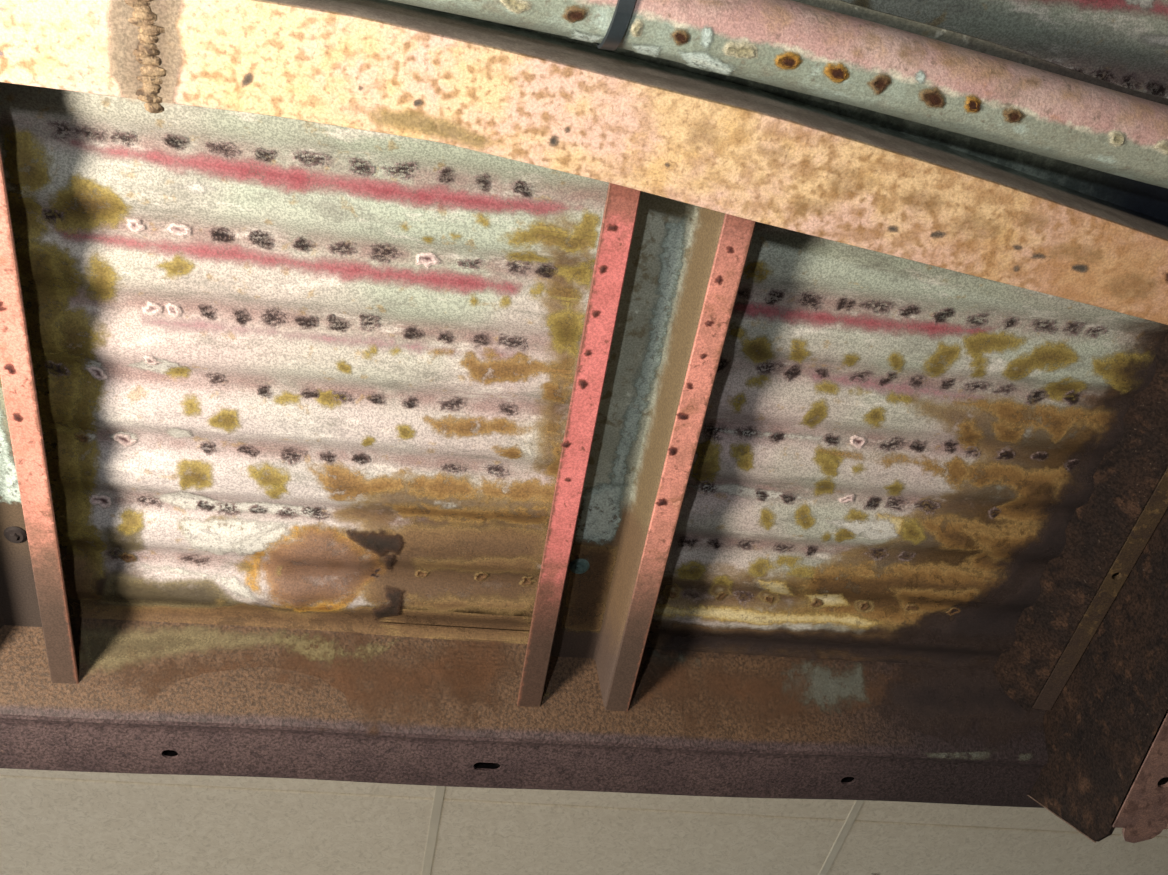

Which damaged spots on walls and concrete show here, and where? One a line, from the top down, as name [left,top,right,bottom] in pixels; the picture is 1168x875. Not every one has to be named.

rust [823,63,849,83]
rust [867,74,891,95]
rust [919,87,945,108]
rust [964,95,981,113]
rust [1003,108,1024,123]